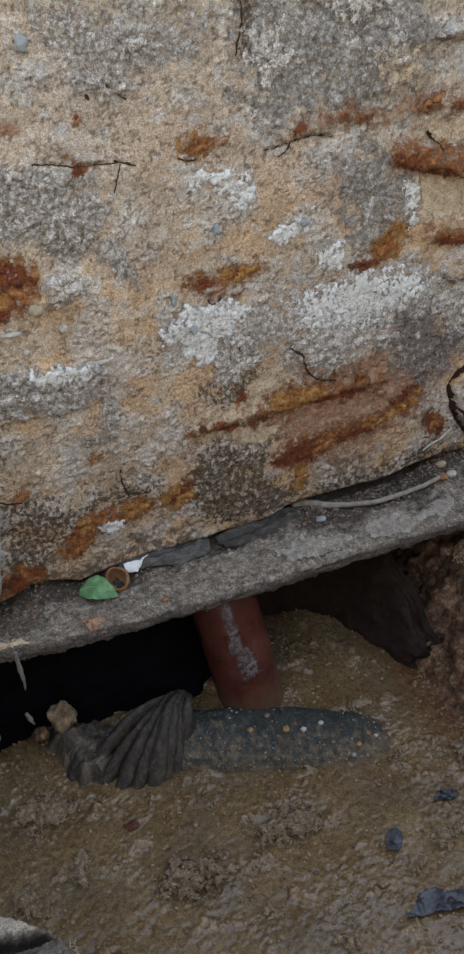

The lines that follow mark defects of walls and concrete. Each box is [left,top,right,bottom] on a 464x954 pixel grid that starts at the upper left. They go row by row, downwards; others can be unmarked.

rust [292,36,464,179]
rust [168,124,230,167]
rust [424,217,464,247]
rust [0,253,42,326]
rust [180,250,267,303]
rust [186,351,449,491]
crack [446,365,464,431]
rust [56,478,198,560]
rust [0,563,48,603]